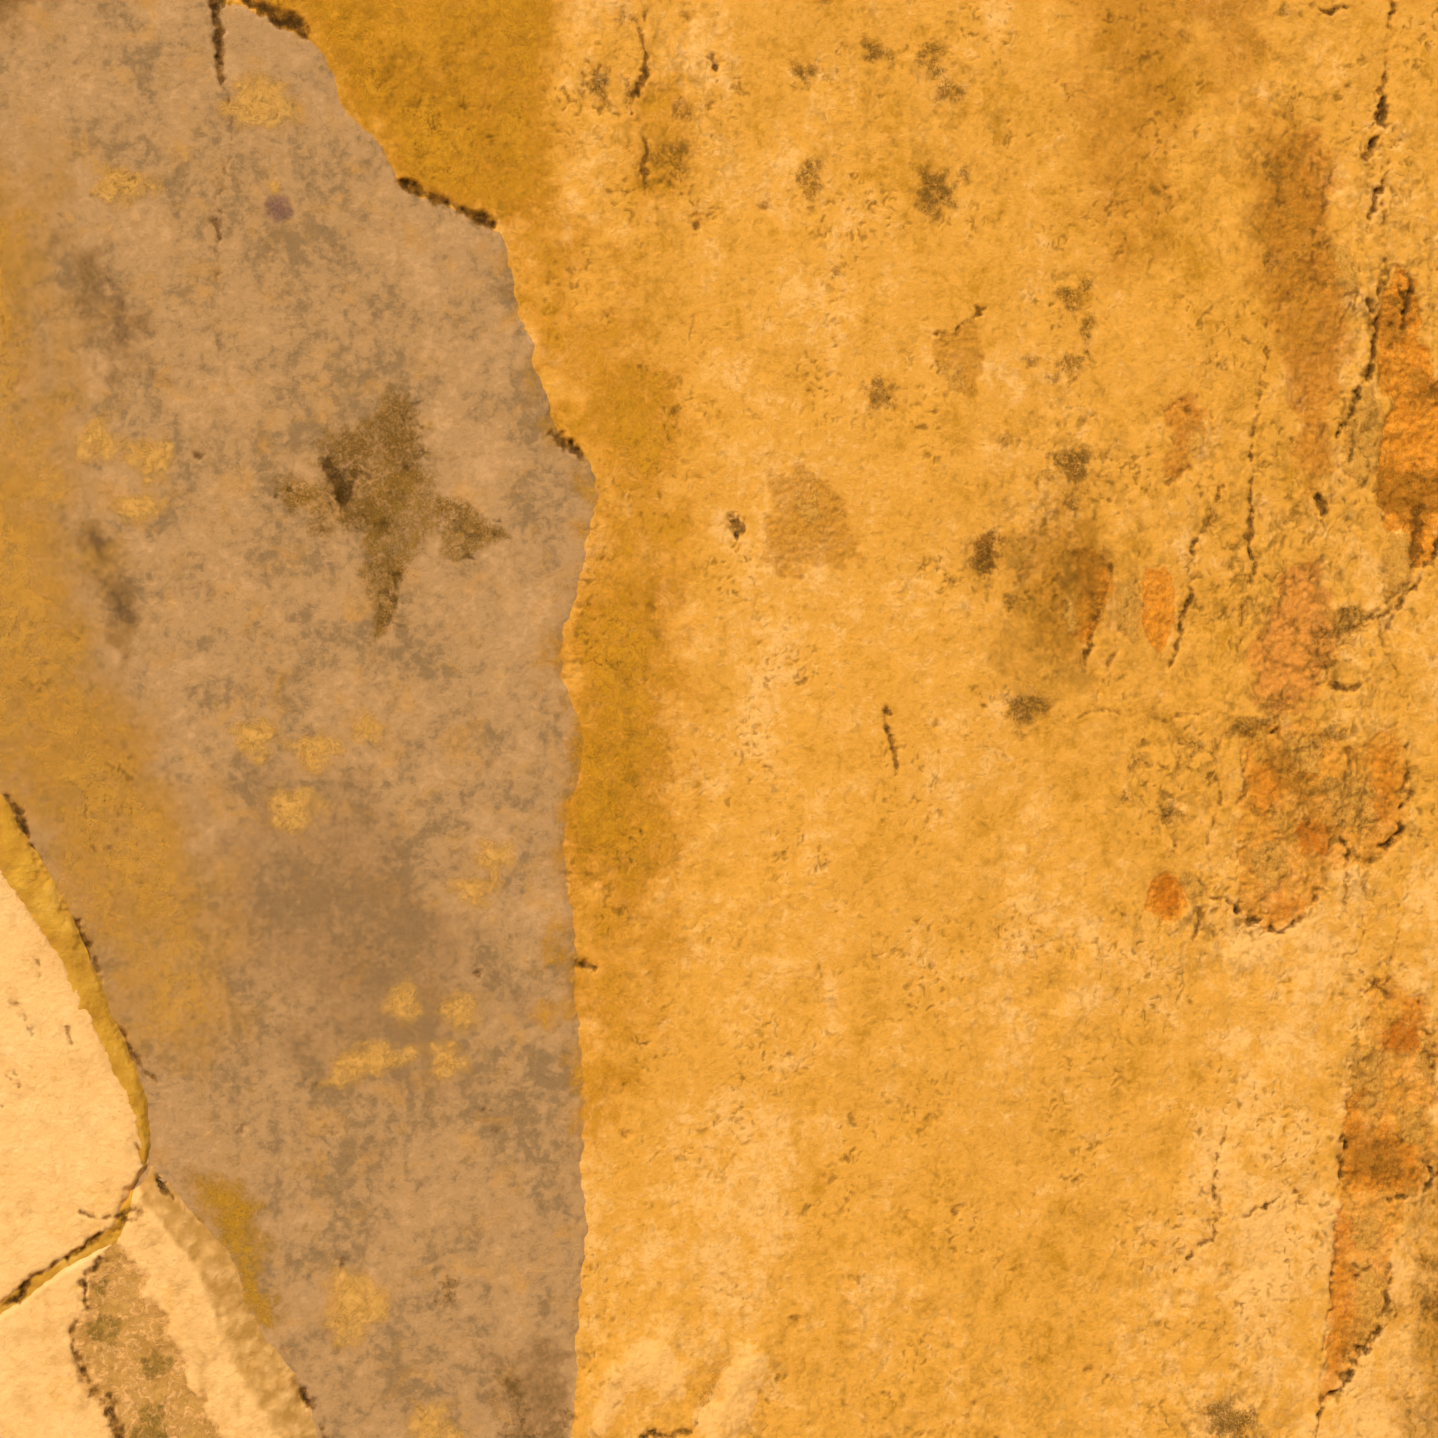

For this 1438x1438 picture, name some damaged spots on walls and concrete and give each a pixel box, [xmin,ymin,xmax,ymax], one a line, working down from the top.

crack [1336,62,1414,462]
water stain [275,389,505,635]
crack [5,795,35,849]
crack [74,919,98,970]
crack [119,1028,155,1079]
crack [4,1145,174,1305]
spalling [69,1243,219,1438]
crack [299,1388,326,1438]